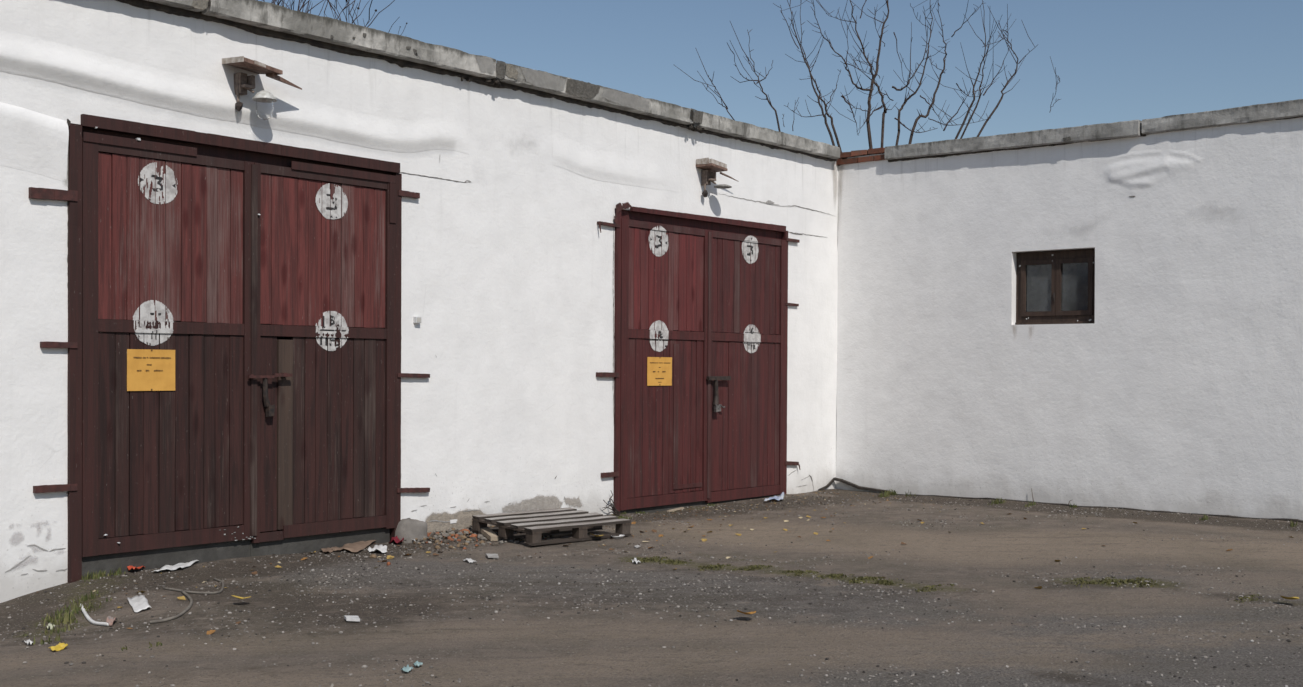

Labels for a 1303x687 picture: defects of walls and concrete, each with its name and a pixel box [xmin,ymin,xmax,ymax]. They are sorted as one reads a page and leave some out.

flaking render [503,496,582,512]
flaking render [426,510,491,536]